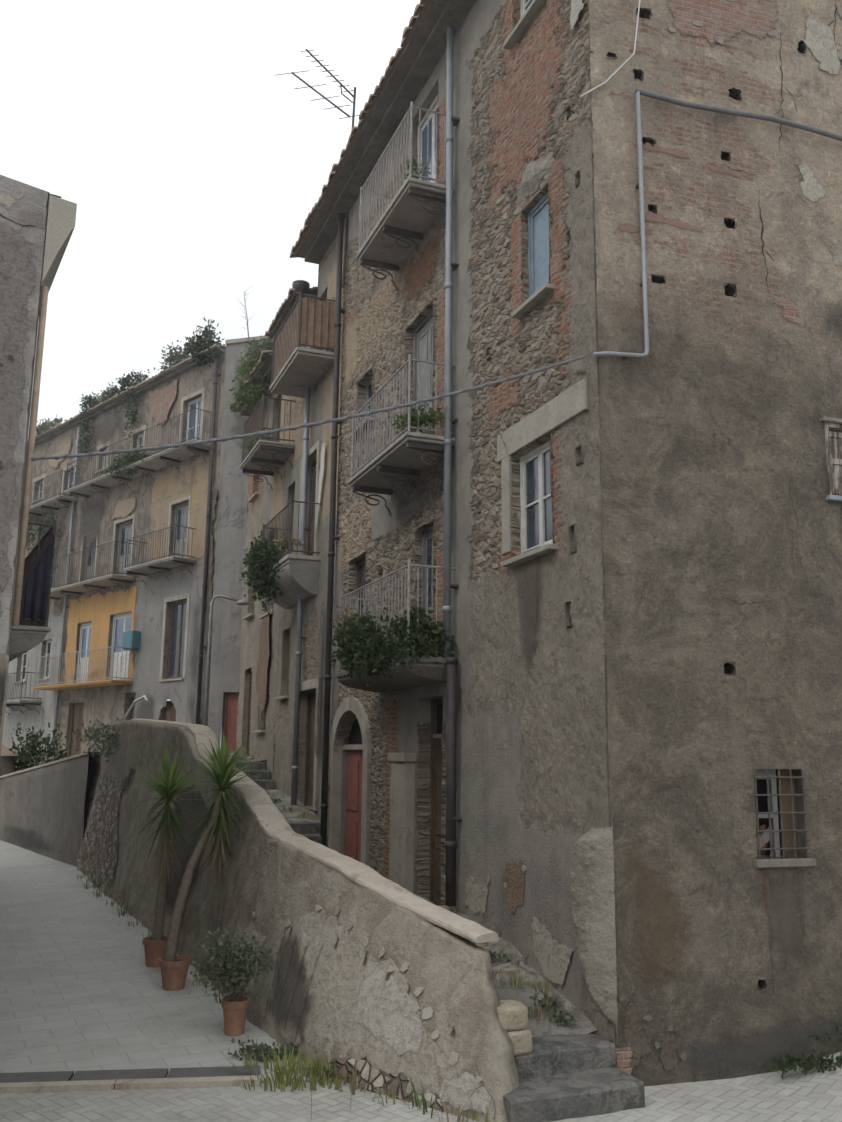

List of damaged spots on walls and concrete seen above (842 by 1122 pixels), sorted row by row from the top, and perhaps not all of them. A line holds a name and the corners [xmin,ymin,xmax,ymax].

peeling [570,0,584,29]
peeling [795,17,842,75]
crack [827,0,842,65]
spalling [727,86,743,101]
spalling [724,217,737,229]
crack [713,161,774,291]
spalling [651,274,666,285]
spalling [724,282,737,297]